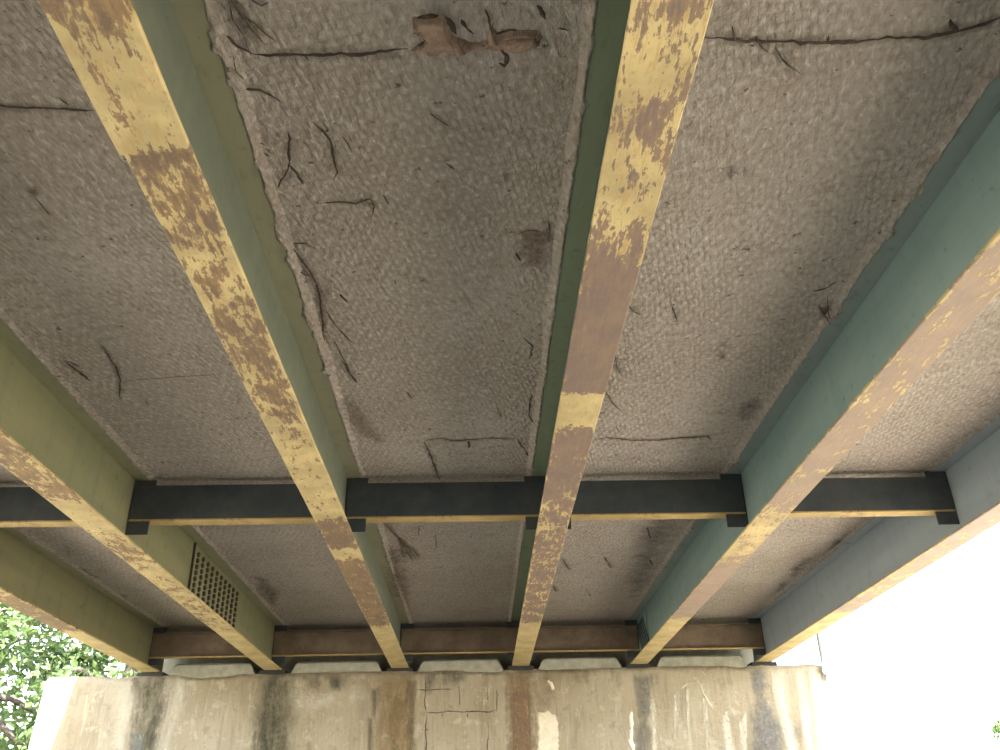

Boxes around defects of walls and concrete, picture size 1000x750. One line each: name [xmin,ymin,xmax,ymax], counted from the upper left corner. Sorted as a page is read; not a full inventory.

crack [227,9,518,68]
spalling [411,15,543,58]
crack [536,5,568,31]
crack [705,17,1000,46]
crack [0,99,94,112]
crack [246,88,283,104]
crack [260,132,303,188]
crack [313,122,389,215]
crack [515,221,551,261]
crack [294,243,354,379]
crack [424,395,533,480]
damp [259,677,287,750]